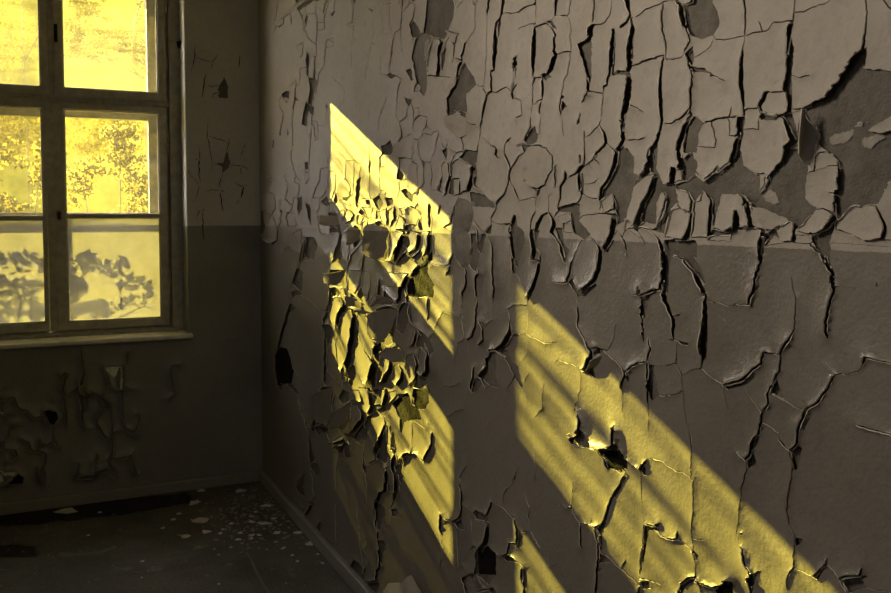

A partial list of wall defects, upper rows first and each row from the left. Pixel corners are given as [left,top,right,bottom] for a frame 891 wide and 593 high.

peeling [296,0,334,78]
crack [187,147,248,212]
peeling [380,0,891,375]
flaking render [276,347,296,386]
peeling [295,168,434,523]
peeling [573,433,644,584]
peeling [376,575,421,593]
flaking render [715,582,733,593]